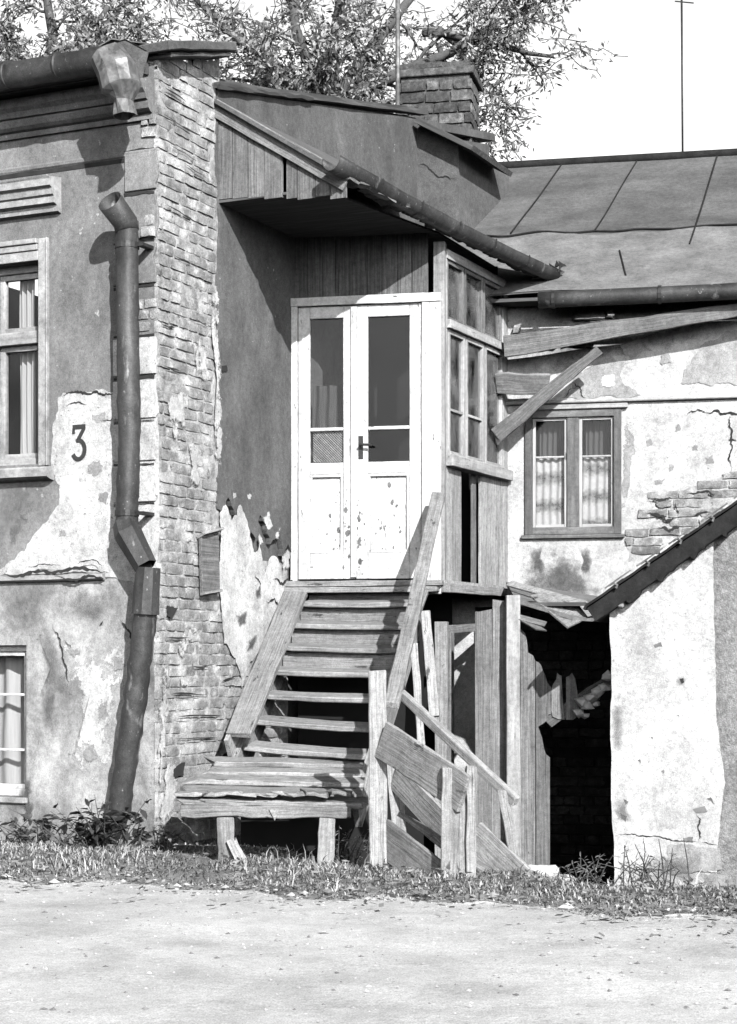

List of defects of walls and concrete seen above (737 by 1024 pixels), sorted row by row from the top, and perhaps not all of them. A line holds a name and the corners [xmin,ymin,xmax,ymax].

peeling [0,389,135,582]
peeling [138,392,201,568]
flaking render [624,465,737,562]
crack [687,409,737,464]
spalling [219,492,290,687]
water stain [531,551,590,594]
crack [52,625,72,687]
crack [618,817,724,883]